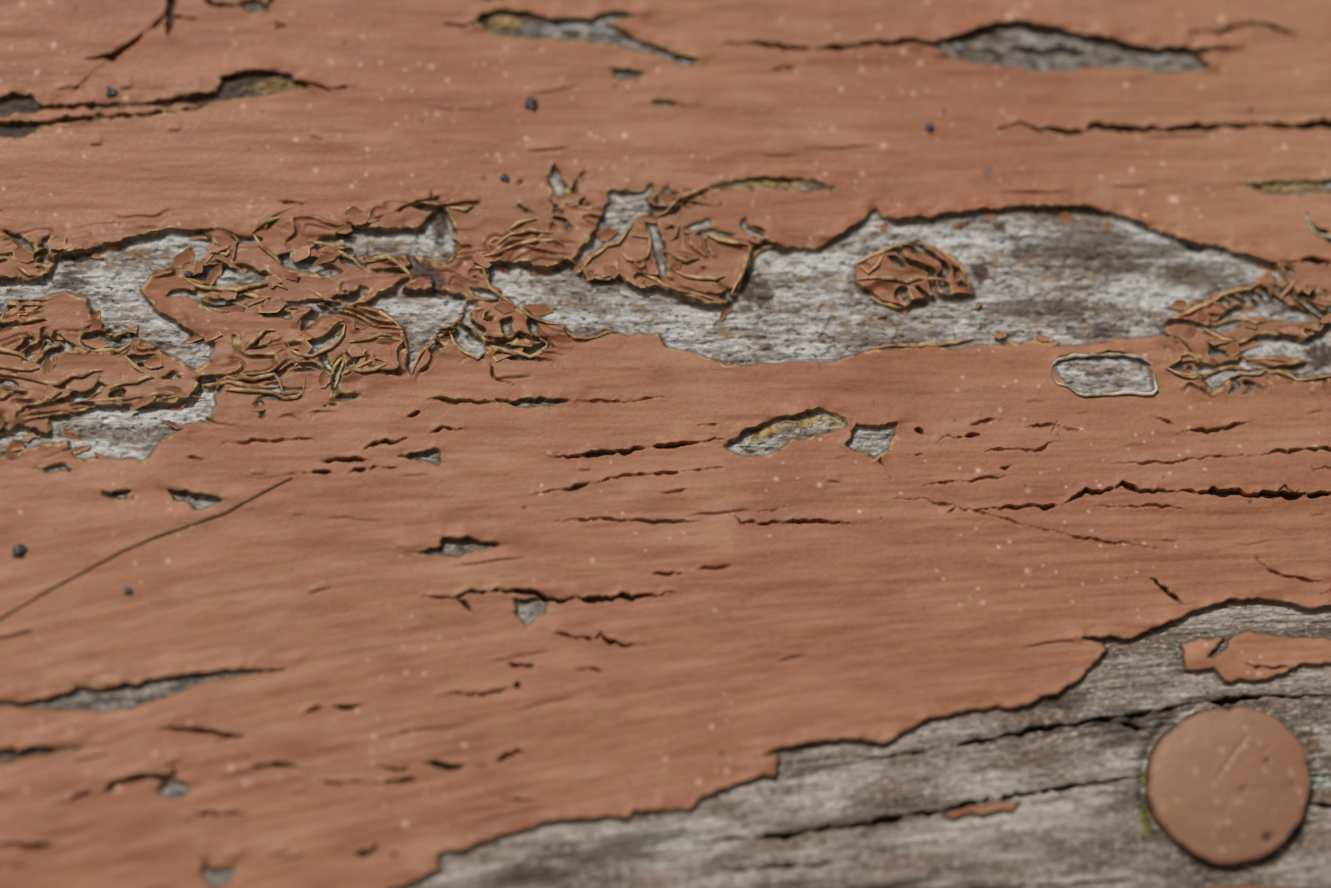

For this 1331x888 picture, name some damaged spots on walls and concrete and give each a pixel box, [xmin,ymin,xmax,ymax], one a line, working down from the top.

peeling [0,66,313,143]
peeling [471,5,708,112]
peeling [920,16,1240,79]
crack [999,118,1331,137]
peeling [0,159,1331,478]
crack [534,423,852,527]
crack [878,415,1331,606]
crack [422,563,735,699]
peeling [0,664,300,719]
peeling [385,593,1331,888]
crack [864,662,1331,762]
crack [692,775,1145,874]